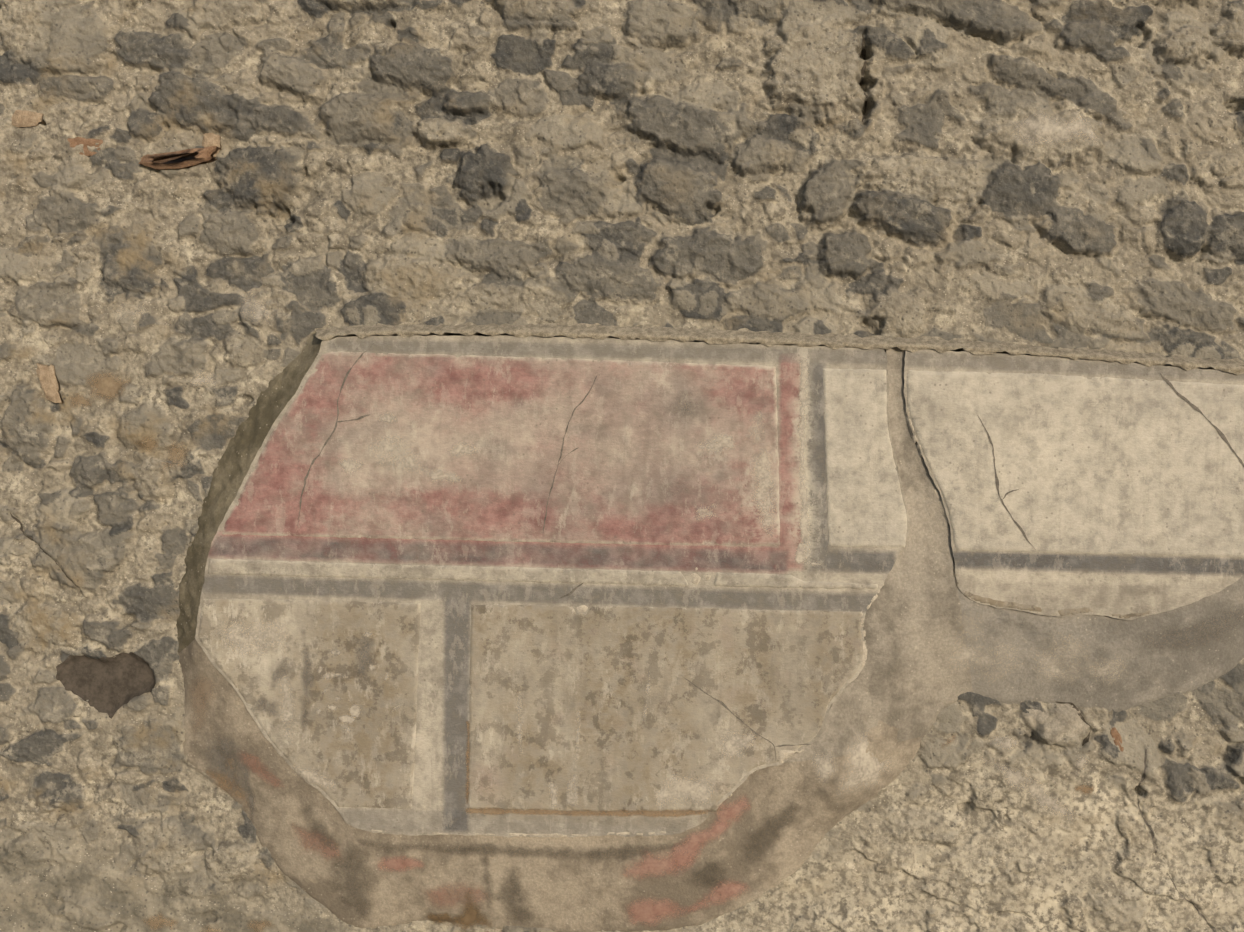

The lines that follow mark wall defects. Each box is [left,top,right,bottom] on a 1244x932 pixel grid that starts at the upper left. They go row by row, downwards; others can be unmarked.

crack [297,343,374,526]
crack [543,376,597,531]
crack [978,416,1036,550]
crack [1160,373,1244,467]
flaking render [861,590,880,667]
peeling [317,667,360,732]
peeling [658,781,732,809]
flaking render [779,749,804,764]
crack [1135,749,1223,932]